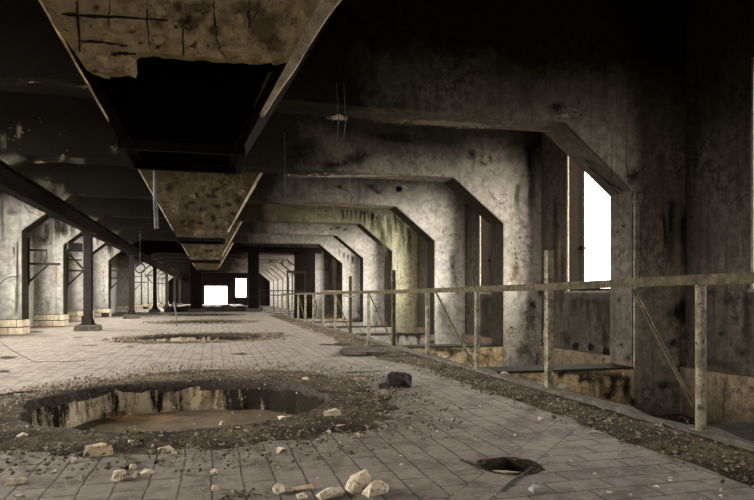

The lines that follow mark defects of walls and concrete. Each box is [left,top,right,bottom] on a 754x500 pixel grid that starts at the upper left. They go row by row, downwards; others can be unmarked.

crack [62,0,184,57]
crack [213,0,226,58]
water stain [342,210,411,281]
water stain [430,340,474,362]
spalling [12,379,336,434]
water stain [554,370,636,406]